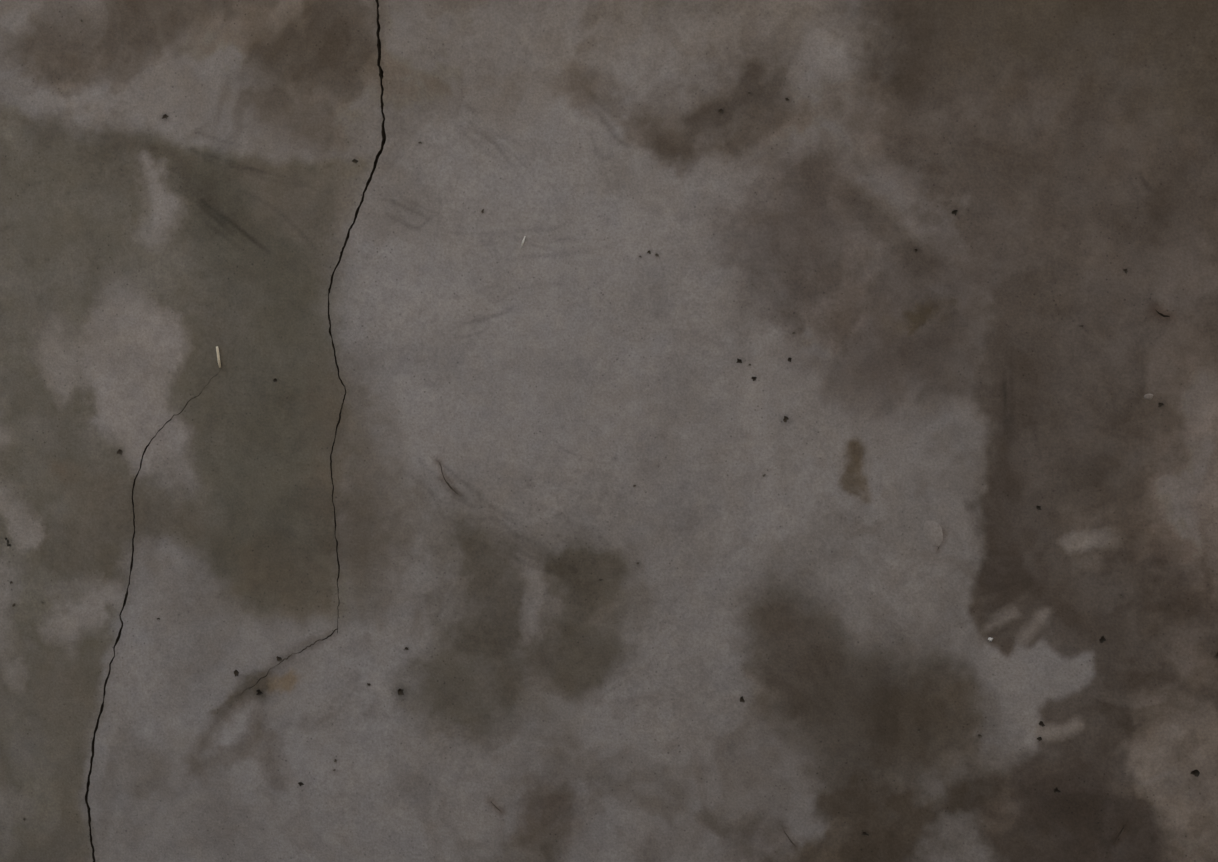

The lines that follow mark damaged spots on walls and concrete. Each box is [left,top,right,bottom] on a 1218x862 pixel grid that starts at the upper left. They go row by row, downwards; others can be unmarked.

crack [85,369,221,862]
crack [239,0,386,696]
leakage [0,0,674,862]
leakage [537,0,1218,862]